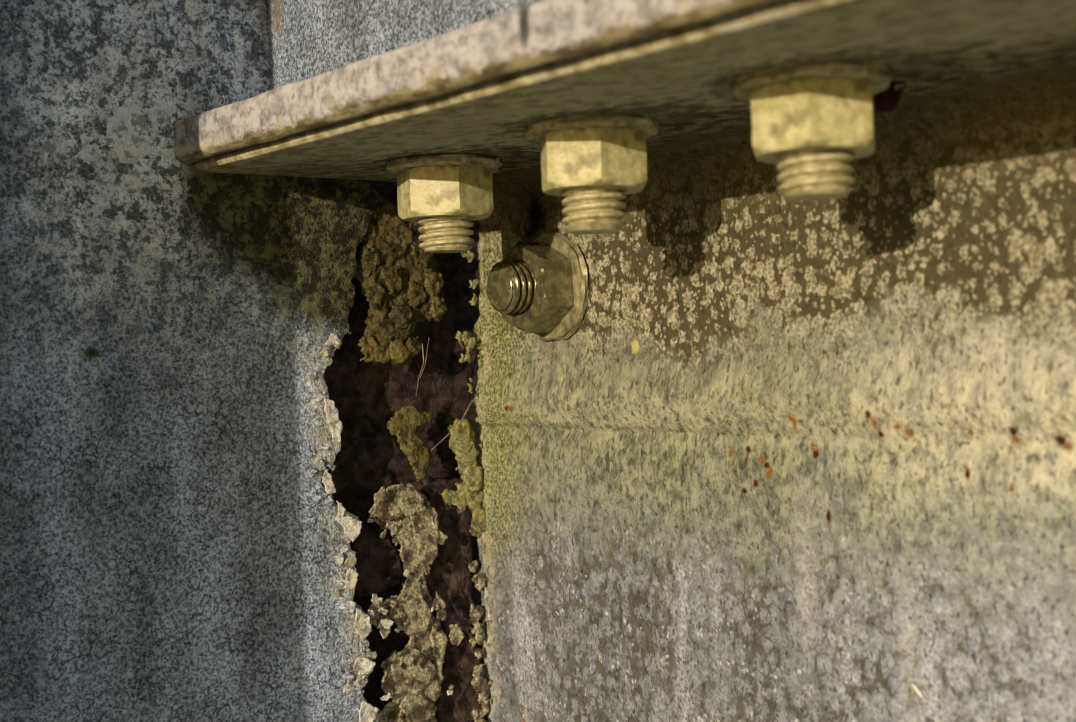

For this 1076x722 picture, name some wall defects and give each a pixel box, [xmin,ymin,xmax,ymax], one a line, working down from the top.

rust [1055,434,1072,451]
rust [742,446,773,494]
peeling [441,489,467,513]